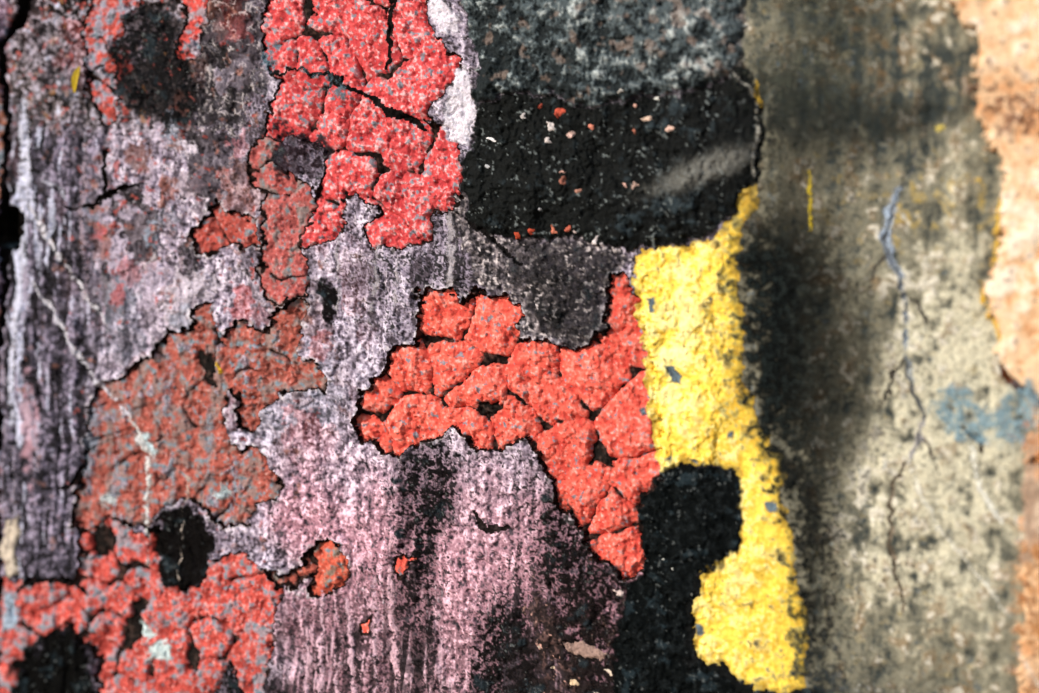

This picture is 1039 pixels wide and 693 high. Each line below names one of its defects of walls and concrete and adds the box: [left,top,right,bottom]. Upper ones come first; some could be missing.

crack [0,0,33,211]
peeling [544,108,575,143]
crack [0,247,14,376]
crack [0,401,88,618]
peeling [0,0,477,693]
peeling [350,271,671,596]
crack [868,148,940,613]